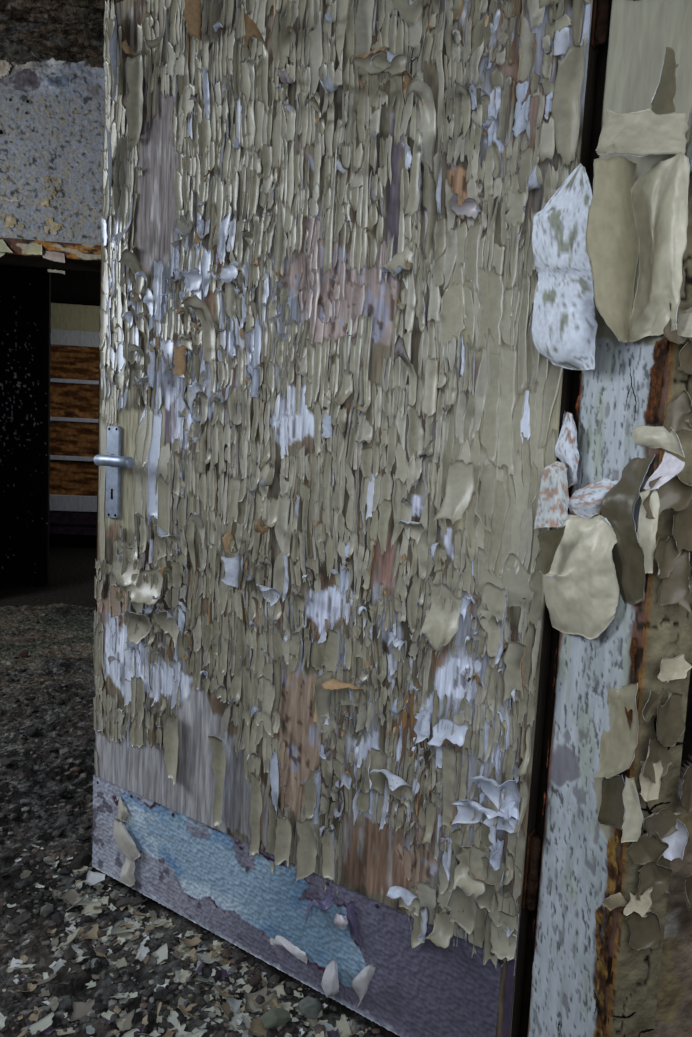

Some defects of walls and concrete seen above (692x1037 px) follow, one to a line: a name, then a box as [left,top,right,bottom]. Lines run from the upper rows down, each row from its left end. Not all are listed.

peeling [0,58,70,115]
peeling [0,239,13,257]
peeling [26,244,65,274]
peeling [532,47,692,614]
peeling [93,0,591,975]
peeling [502,514,619,639]
peeling [593,653,692,951]